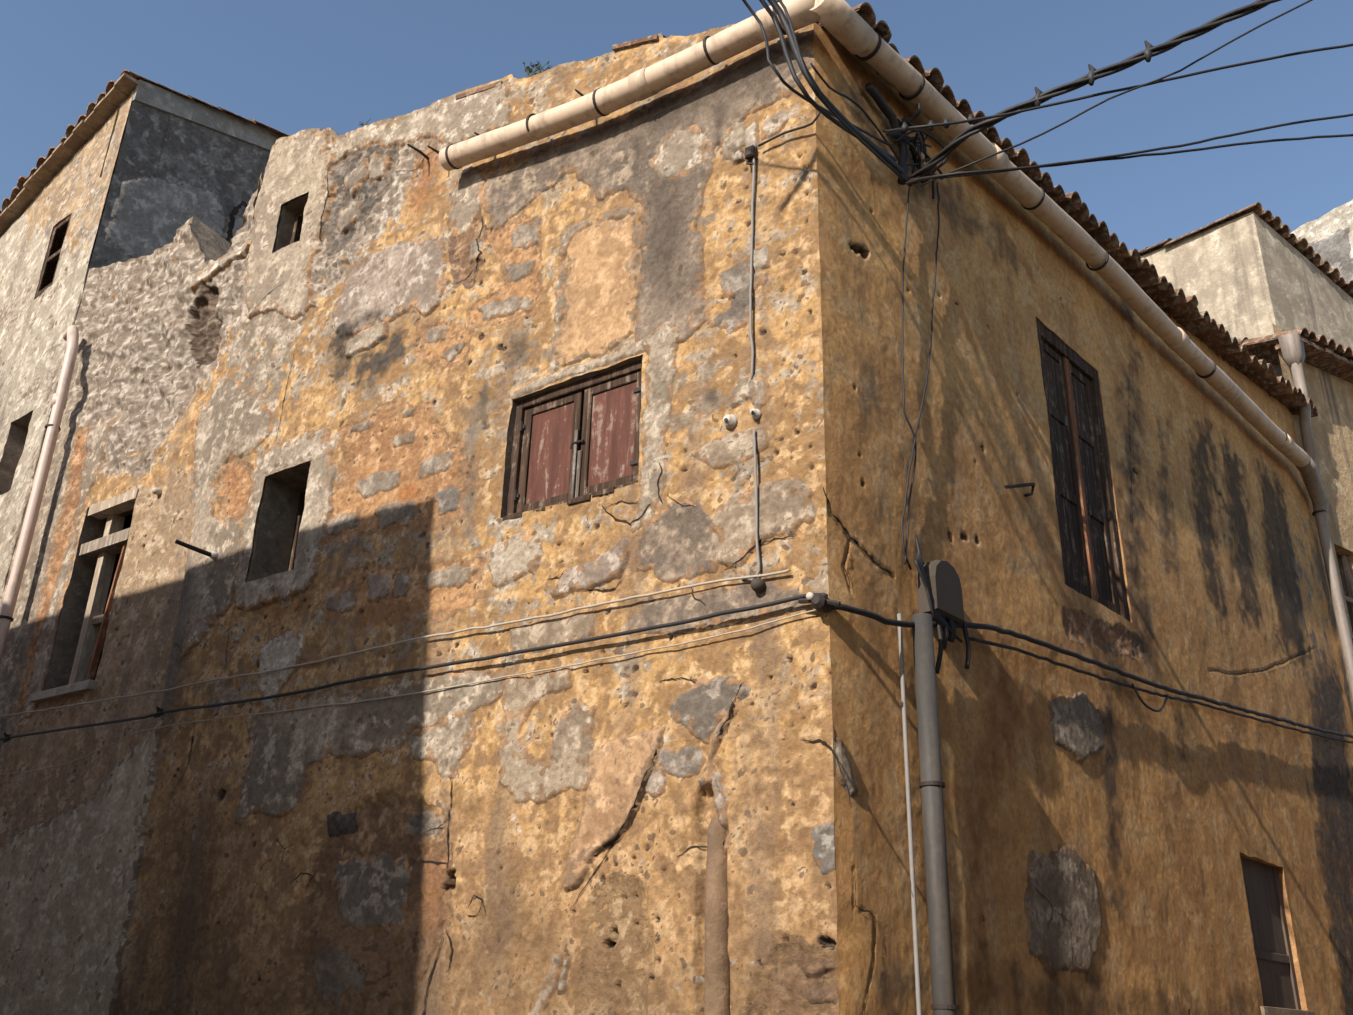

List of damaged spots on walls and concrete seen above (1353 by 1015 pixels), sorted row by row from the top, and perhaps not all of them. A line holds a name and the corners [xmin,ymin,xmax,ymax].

spalling [185,285,223,369]
crack [602,463,693,525]
water stain [1124,390,1153,657]
water stain [1191,422,1306,664]
spalling [294,793,456,1015]
crack [573,747,661,906]
water stain [1103,699,1119,867]
water stain [1310,662,1353,1015]